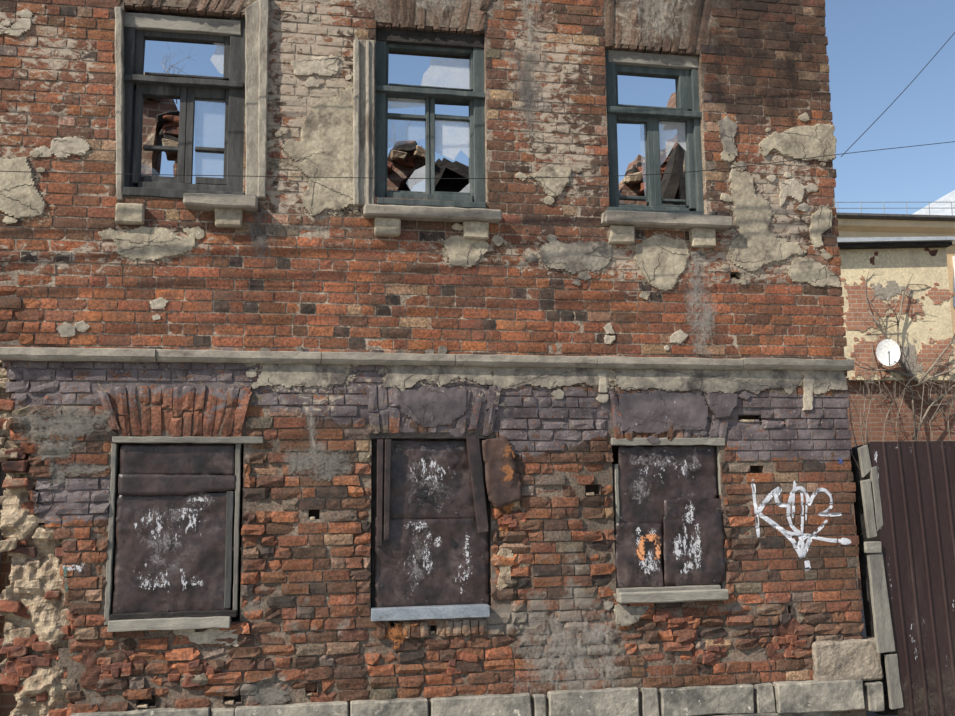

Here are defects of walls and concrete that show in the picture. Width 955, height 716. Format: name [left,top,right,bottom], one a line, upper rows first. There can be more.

peeling [30,146,52,174]
peeling [720,151,747,170]
crack [278,138,350,214]
peeling [796,183,818,212]
peeling [98,228,119,240]
peeling [183,226,205,240]
flaking render [379,275,955,444]
flaking render [244,363,359,391]
spalling [1,448,38,515]
spalling [6,538,37,558]